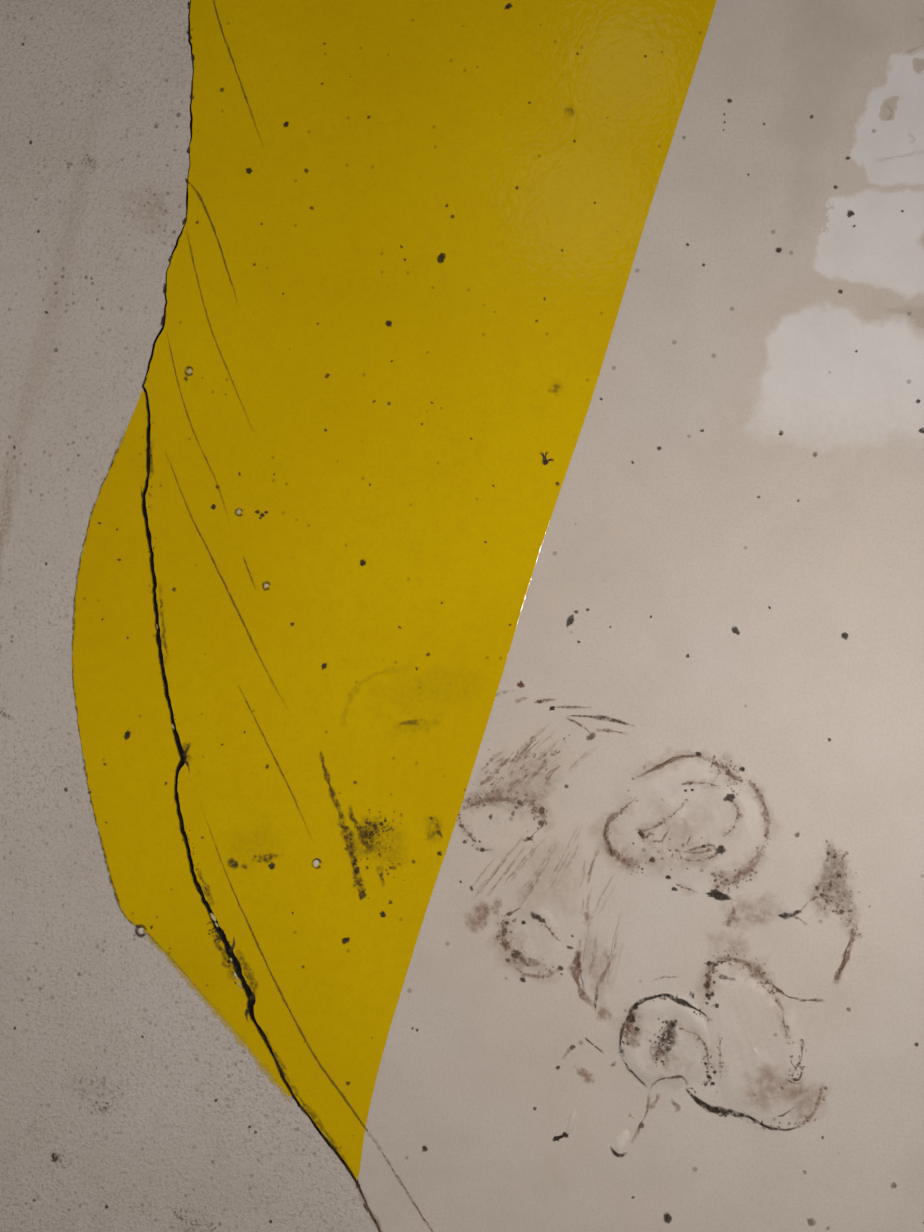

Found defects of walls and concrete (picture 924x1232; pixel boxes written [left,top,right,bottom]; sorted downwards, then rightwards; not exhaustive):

crack [141,0,381,1232]
peeling [732,48,924,460]